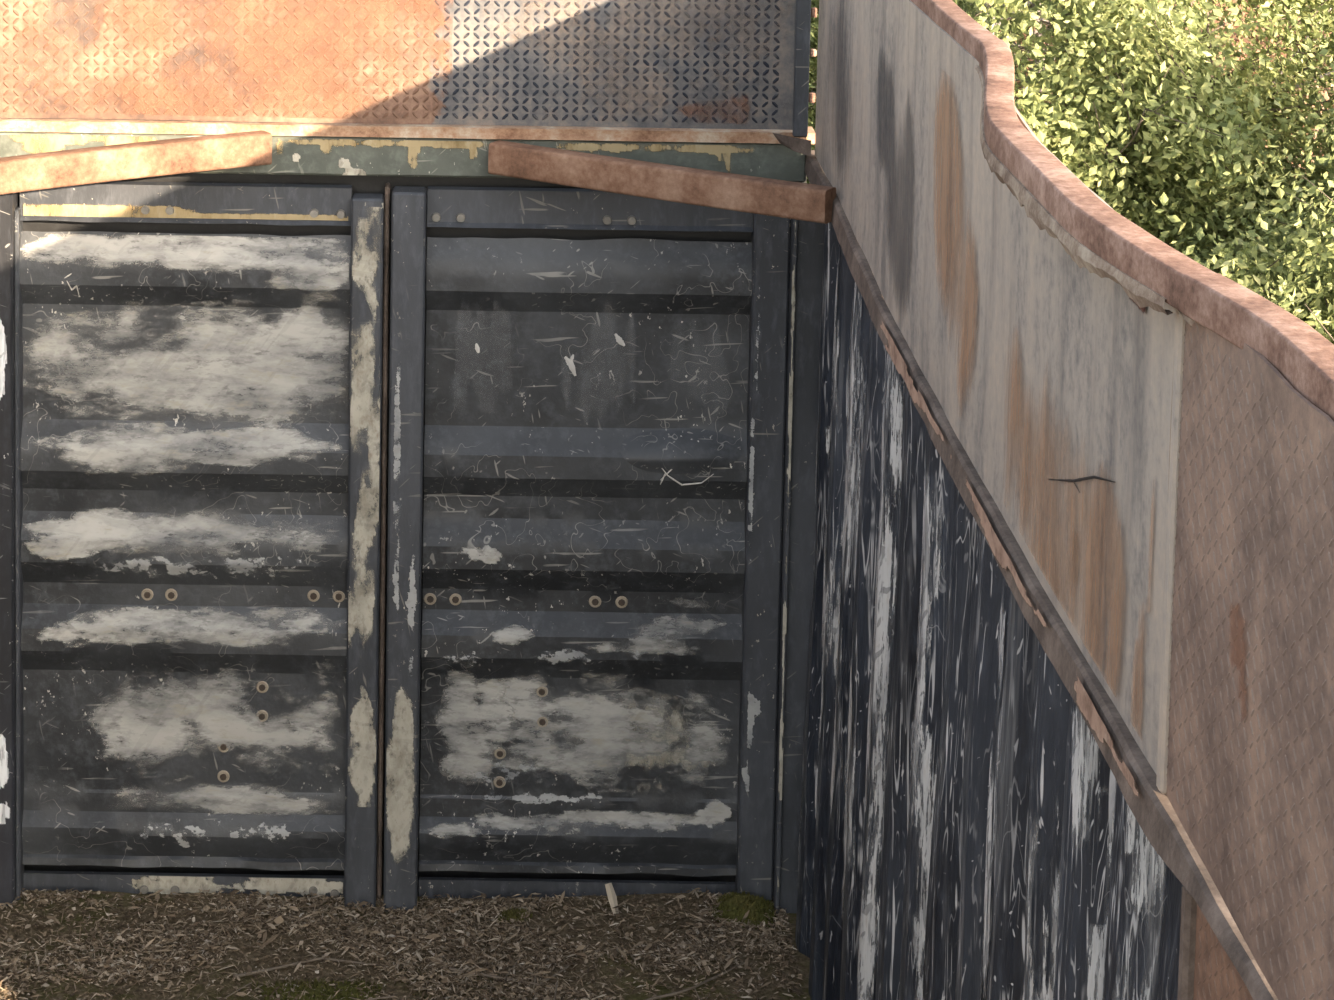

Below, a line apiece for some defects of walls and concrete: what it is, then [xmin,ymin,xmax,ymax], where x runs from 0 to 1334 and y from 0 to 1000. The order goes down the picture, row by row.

peeling [339,158,366,175]
rust [557,143,753,171]
rust [934,81,977,398]
peeling [23,207,417,647]
peeling [787,266,795,495]
rust [880,322,951,458]
rust [966,479,1046,627]
peeling [88,669,415,860]
peeling [429,603,732,838]
peeling [742,691,761,792]
peeling [778,602,787,800]